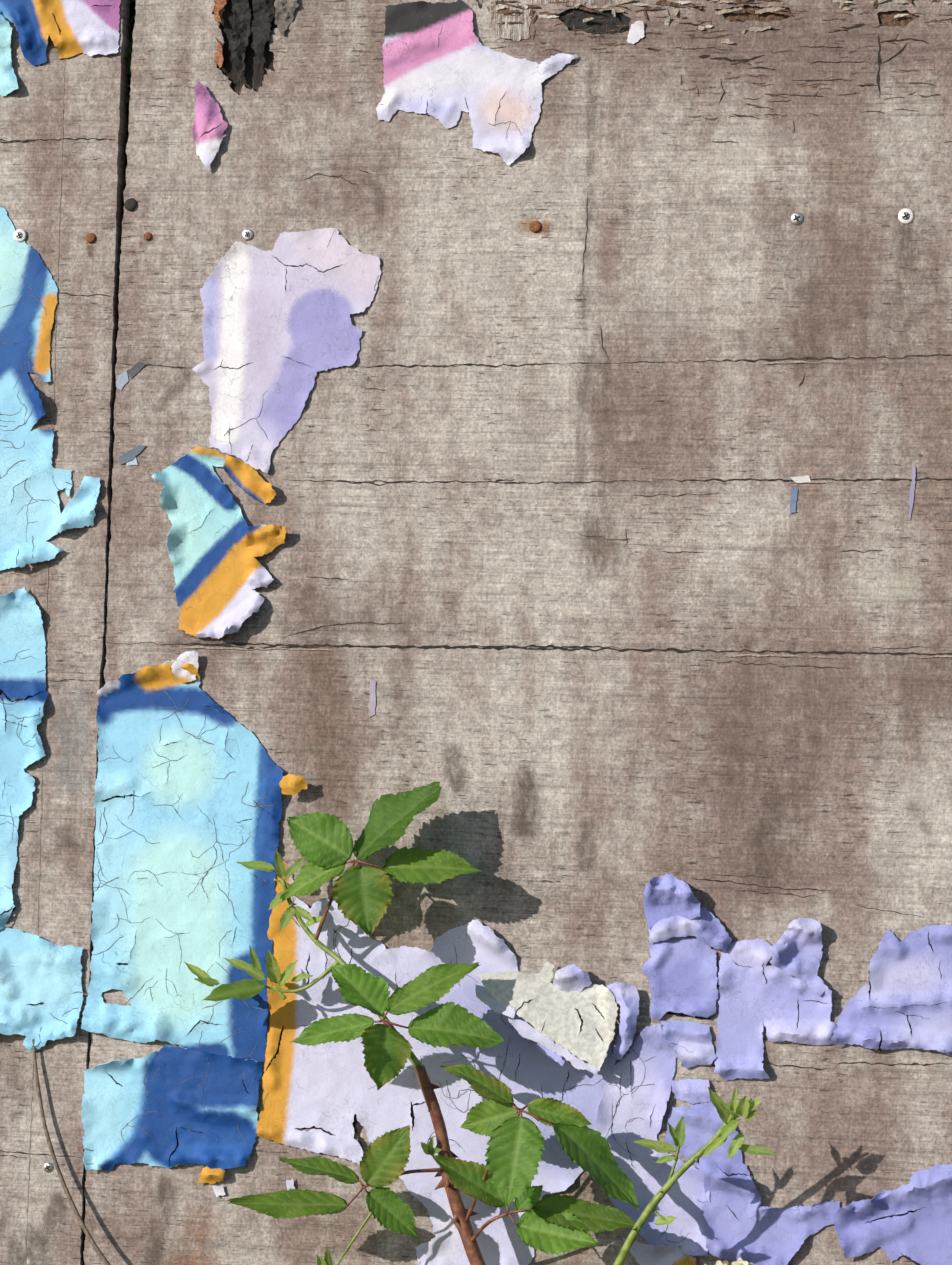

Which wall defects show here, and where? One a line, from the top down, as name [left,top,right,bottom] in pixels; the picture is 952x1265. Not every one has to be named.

peeling [0,0,121,97]
peeling [376,0,578,166]
peeling [627,21,645,44]
crack [581,191,589,277]
peeling [0,207,101,571]
peeling [152,228,381,639]
crack [356,324,952,390]
crack [285,477,952,497]
crack [107,622,952,669]
peeling [0,587,952,1265]